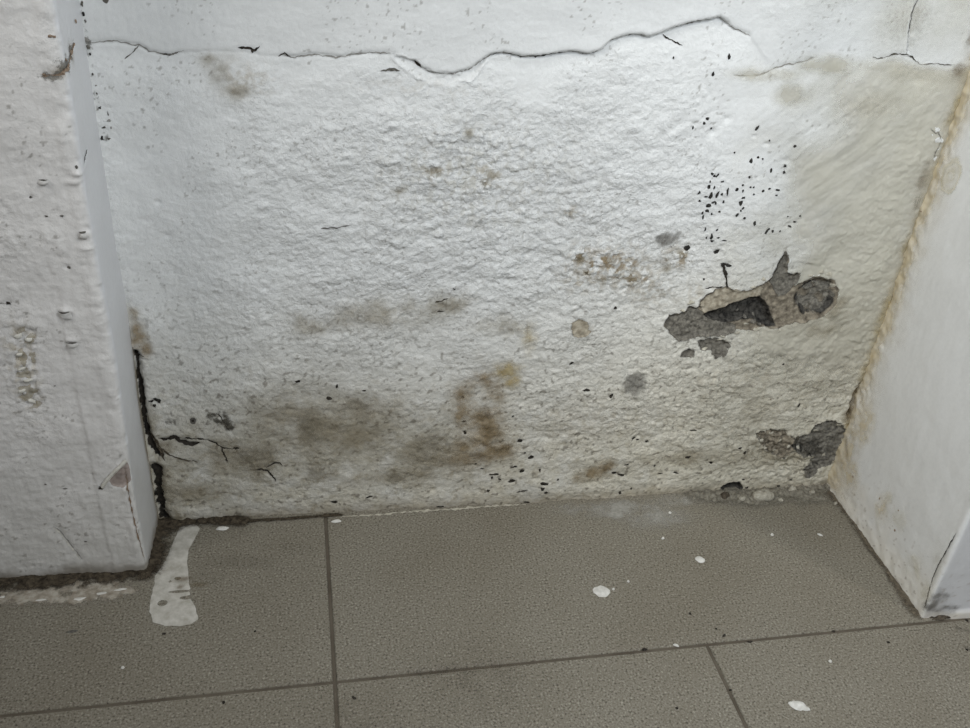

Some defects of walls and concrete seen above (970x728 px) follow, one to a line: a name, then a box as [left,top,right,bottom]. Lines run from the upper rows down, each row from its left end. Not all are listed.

crack [42,19,182,81]
crack [238,17,750,74]
crack [738,57,814,76]
crack [874,0,951,66]
spalling [664,251,840,359]
water stain [698,63,970,483]
crack [134,350,234,518]
water stain [206,413,234,430]
crack [256,462,282,482]
spalling [756,419,846,487]